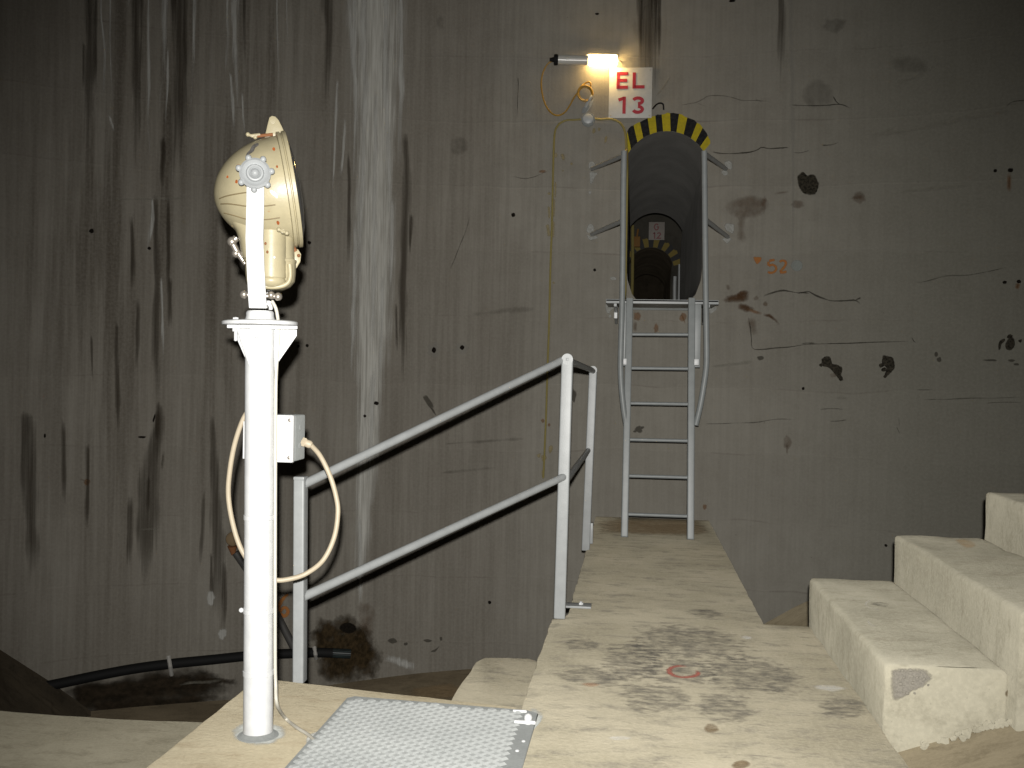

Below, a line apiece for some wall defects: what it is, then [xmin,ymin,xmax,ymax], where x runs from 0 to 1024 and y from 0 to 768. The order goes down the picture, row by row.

leakage [333,0,412,588]
corrosion [729,291,750,311]
crack [772,290,860,301]
crack [750,330,874,350]
leakage [313,618,377,680]
spalling [892,668,930,699]